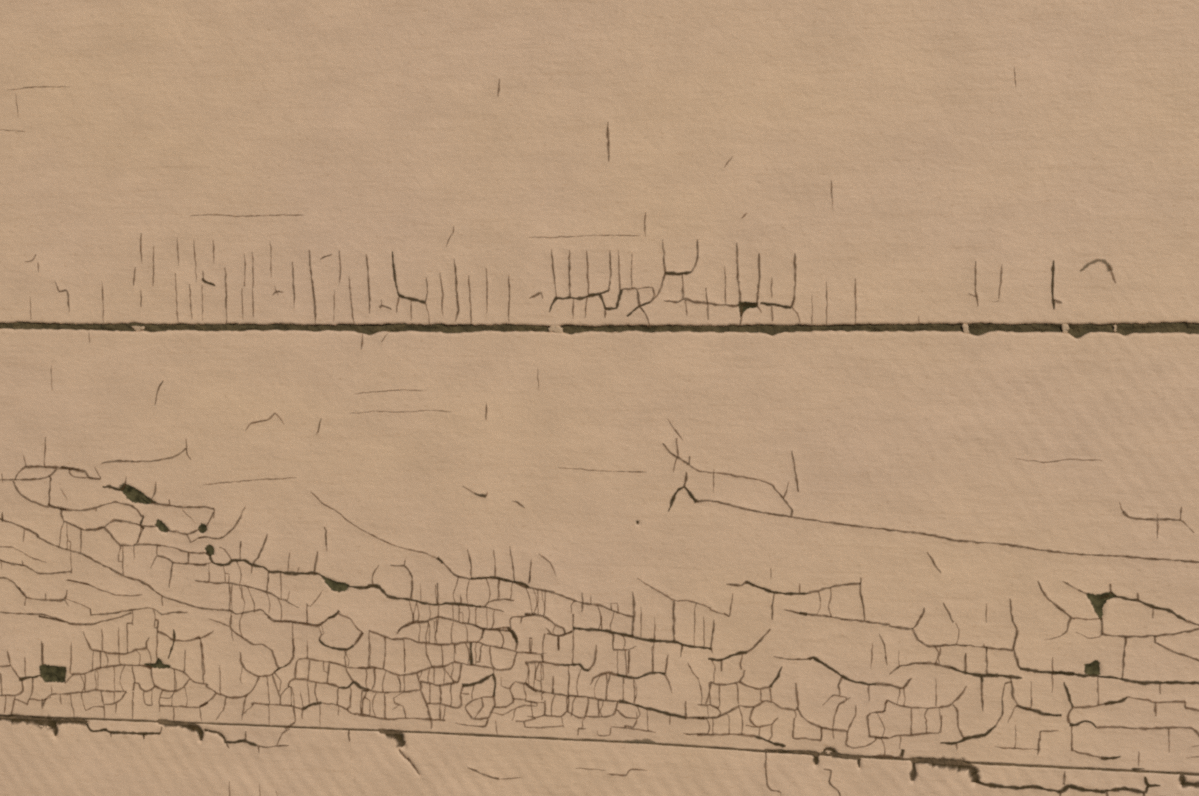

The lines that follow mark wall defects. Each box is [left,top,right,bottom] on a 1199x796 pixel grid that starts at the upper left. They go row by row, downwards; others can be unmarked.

crack [133,213,856,350]
peeling [119,483,157,504]
crack [0,421,1199,796]
peeling [1087,592,1115,620]
peeling [39,664,66,683]
peeling [1084,660,1101,675]